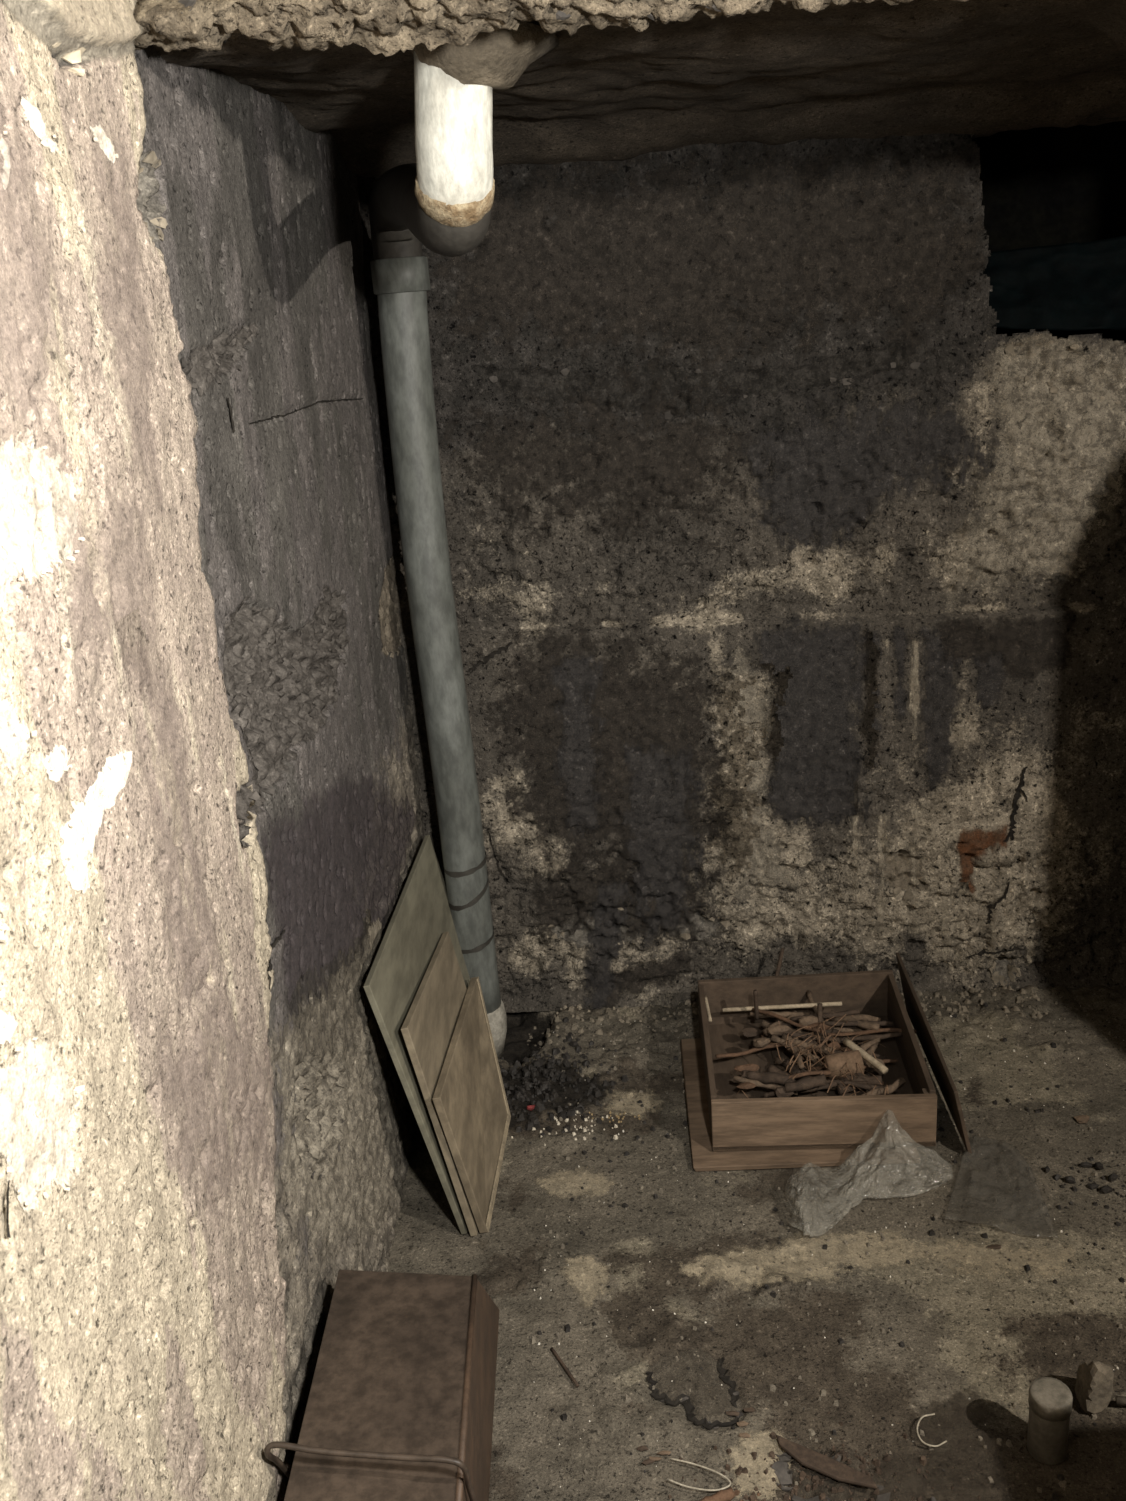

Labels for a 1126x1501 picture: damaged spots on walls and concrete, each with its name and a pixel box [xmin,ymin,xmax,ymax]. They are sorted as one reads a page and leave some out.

spalling [135,0,197,20]
water stain [481,332,1126,1010]
peeling [59,751,133,893]
rust [958,826,1008,893]
crack [1004,767,1028,843]
crack [967,882,1026,959]